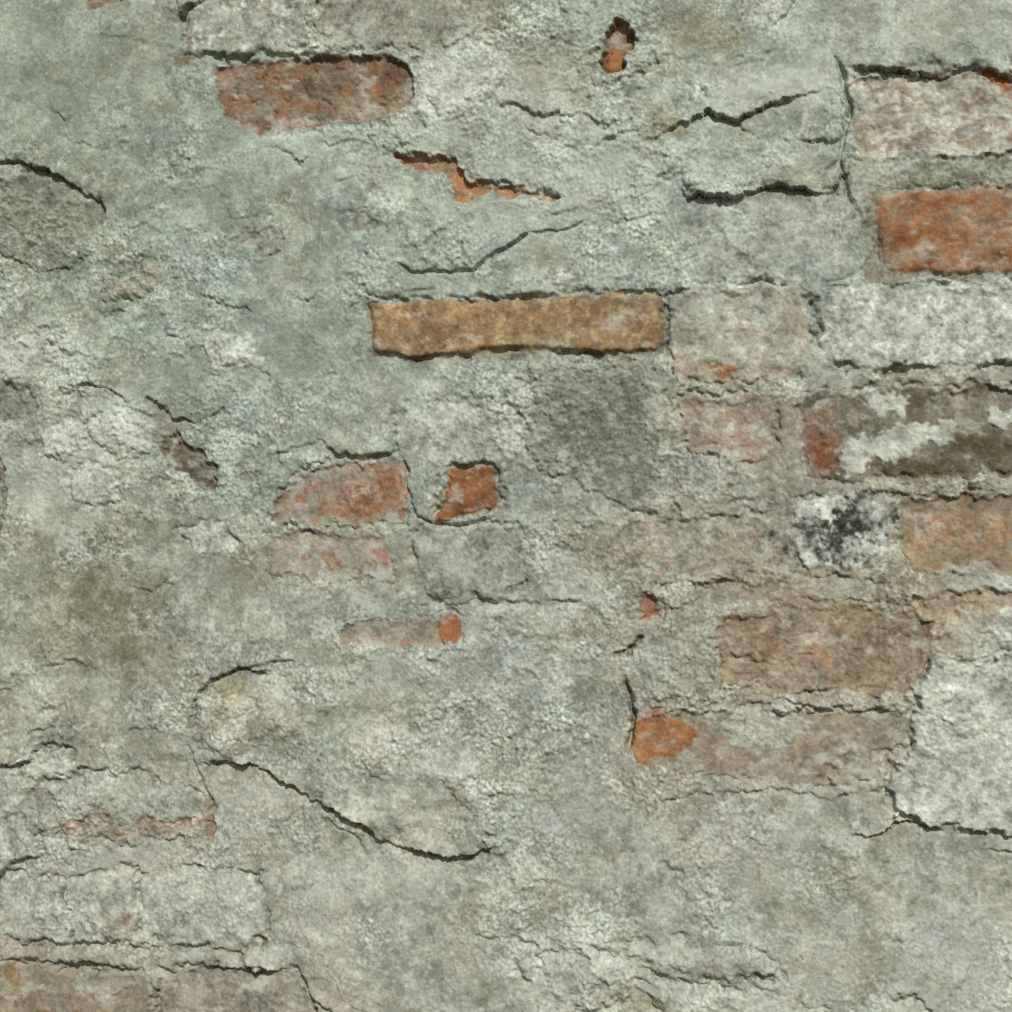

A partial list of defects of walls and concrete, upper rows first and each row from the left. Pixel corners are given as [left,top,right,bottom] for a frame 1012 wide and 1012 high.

spalling [160,0,505,142]
spalling [593,14,647,79]
crack [772,0,803,28]
spalling [842,43,1012,166]
spalling [389,146,566,207]
spalling [364,178,1012,600]
spalling [0,458,8,538]
spalling [263,452,413,587]
crack [185,658,299,799]
spalling [632,592,1012,812]
spalling [0,724,362,1012]
flaking render [199,737,512,864]